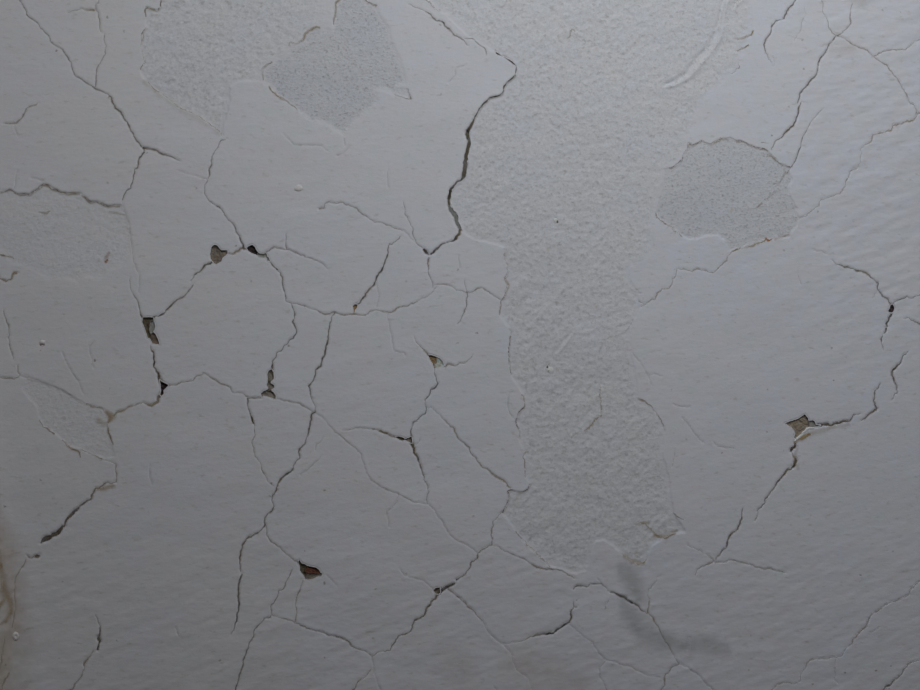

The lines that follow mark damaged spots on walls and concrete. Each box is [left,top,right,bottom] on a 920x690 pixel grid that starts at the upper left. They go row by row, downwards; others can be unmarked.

peeling [140,0,410,136]
crack [423,53,515,255]
peeling [428,0,799,573]
spalling [142,317,159,344]
crack [148,350,162,406]
flaking render [785,415,820,442]
crack [817,393,877,426]
crack [767,443,797,497]
crack [35,485,103,557]
peeling [298,560,322,580]
crack [391,578,458,647]
crack [534,611,572,636]